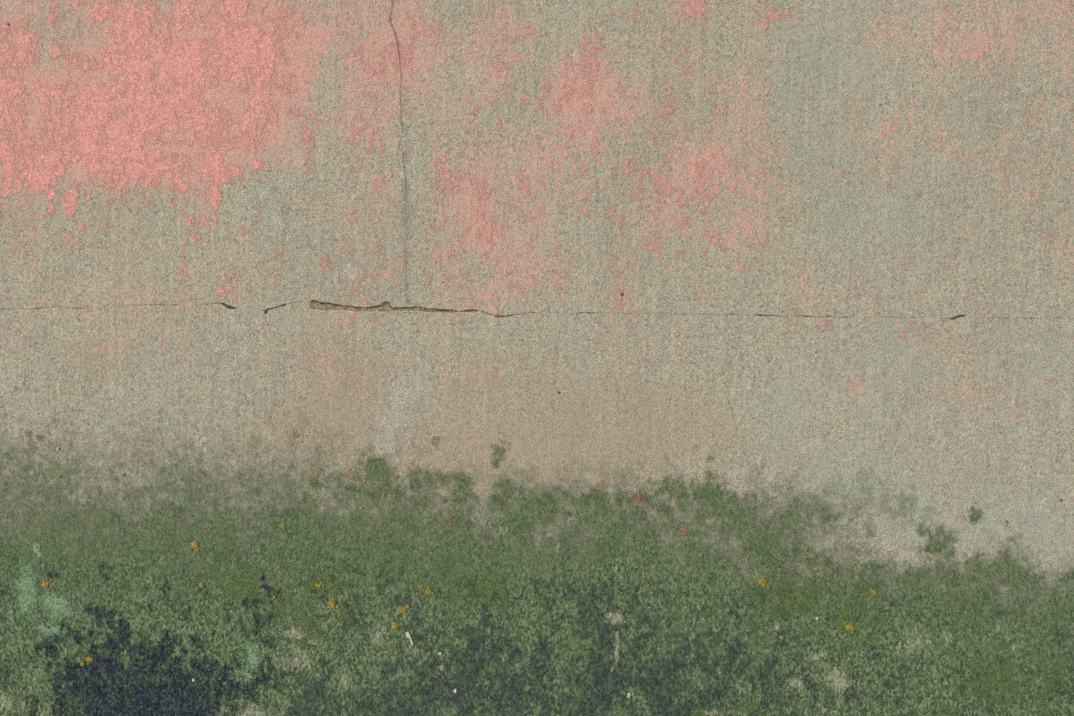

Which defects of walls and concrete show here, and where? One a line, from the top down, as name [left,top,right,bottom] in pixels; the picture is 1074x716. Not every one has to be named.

peeling [0,0,309,278]
crack [264,300,534,317]
leakage [0,542,553,716]
leakage [567,587,750,716]
leakage [758,650,876,716]
leakage [895,624,953,658]